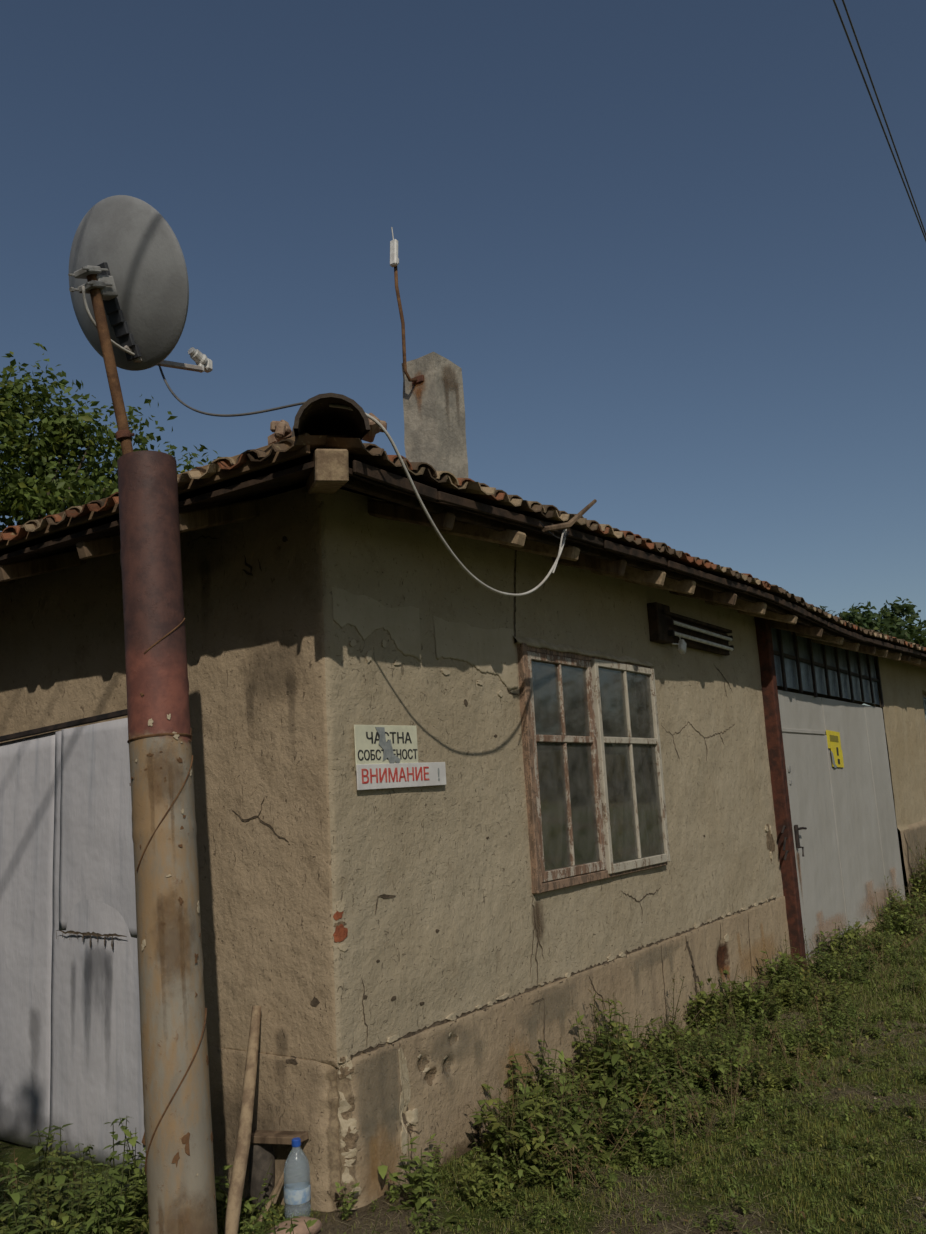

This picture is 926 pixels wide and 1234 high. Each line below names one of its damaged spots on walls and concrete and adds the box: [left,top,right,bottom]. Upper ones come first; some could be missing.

crack [662,722,734,761]
crack [232,799,287,841]
flaking render [333,901,348,952]
crack [351,894,776,1171]
spalling [398,1032,458,1156]
corrosion [172,1132,190,1167]
spalling [327,1056,362,1211]